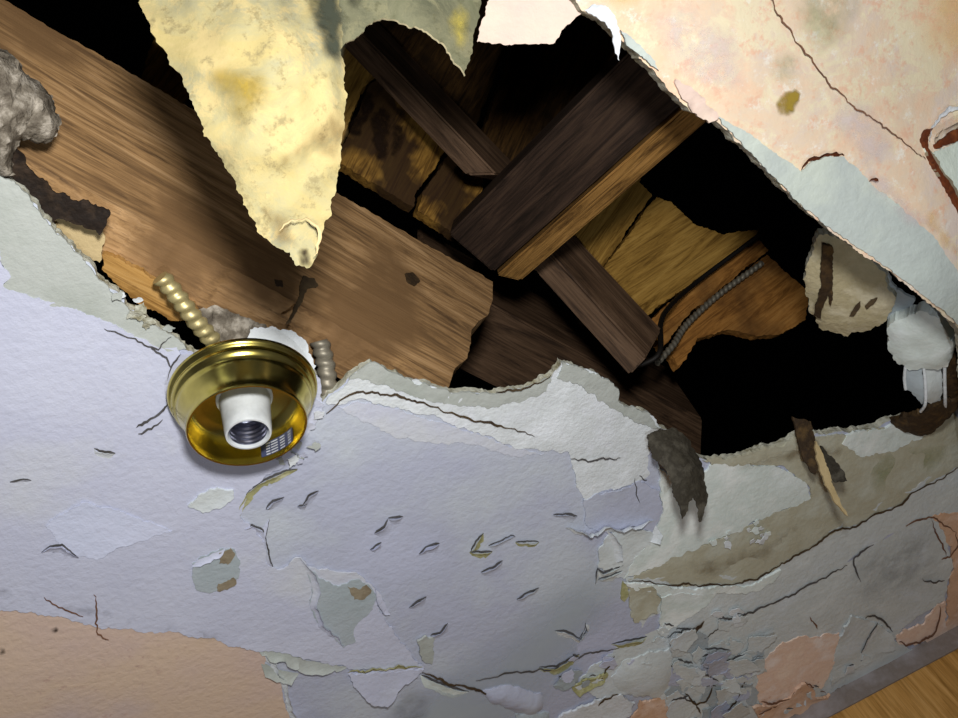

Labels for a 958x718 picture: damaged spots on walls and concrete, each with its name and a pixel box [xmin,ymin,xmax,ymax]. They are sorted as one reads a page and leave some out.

damp [311,0,344,55]
damp [777,90,800,113]
crack [772,0,926,159]
peeling [719,106,958,325]
crack [326,391,535,437]
peeling [0,176,958,718]
crack [628,467,958,616]
crack [866,607,941,647]
crack [422,648,618,706]
crack [687,682,745,713]